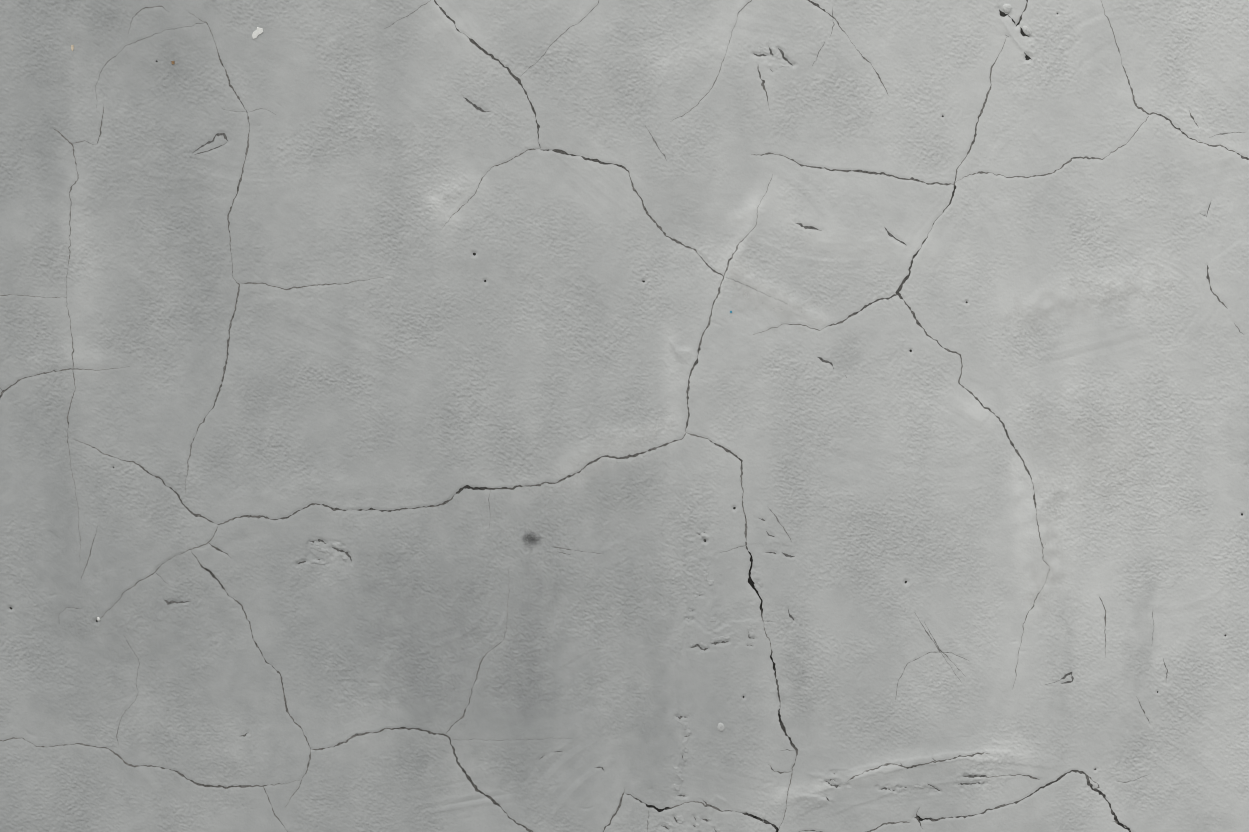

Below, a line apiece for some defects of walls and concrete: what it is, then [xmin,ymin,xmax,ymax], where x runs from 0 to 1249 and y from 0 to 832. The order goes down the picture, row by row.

crack [0,0,822,832]
crack [753,0,1249,686]
crack [848,752,1147,832]